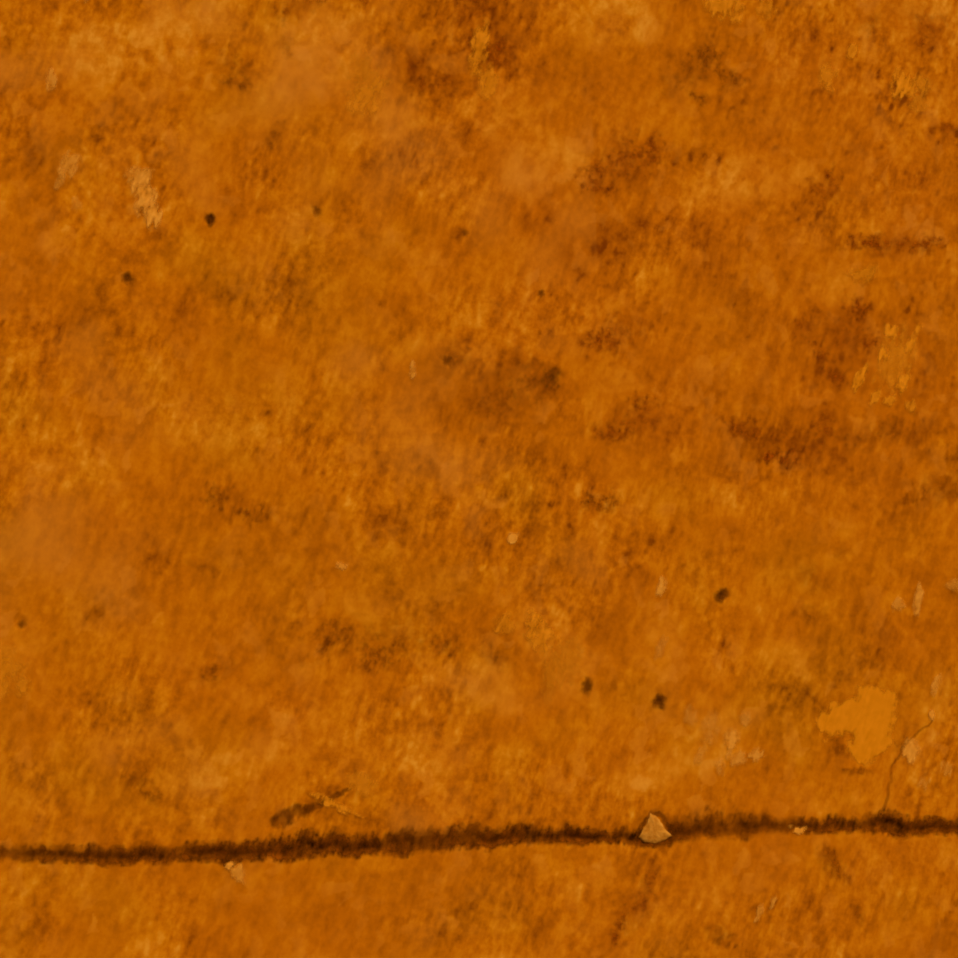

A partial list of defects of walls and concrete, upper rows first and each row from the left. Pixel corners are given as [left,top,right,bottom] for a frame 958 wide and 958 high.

peeling [816,685,898,765]
peeling [903,740,918,763]
crack [16,788,958,867]
spalling [638,813,672,844]